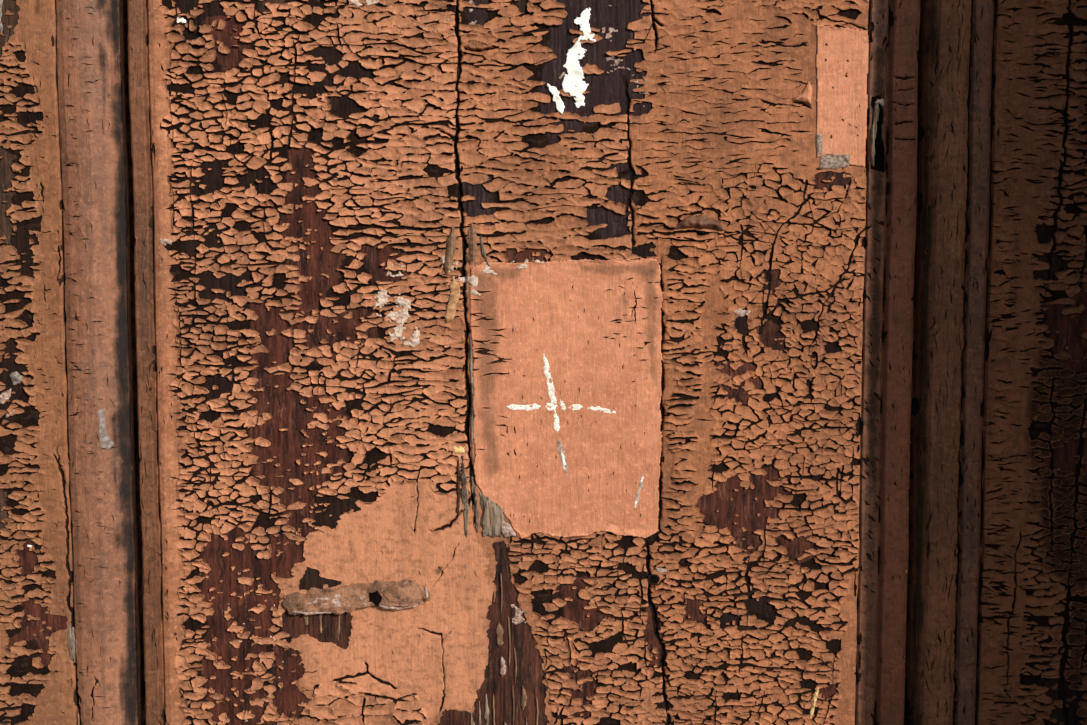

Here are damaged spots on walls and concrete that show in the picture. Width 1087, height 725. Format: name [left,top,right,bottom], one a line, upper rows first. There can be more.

peeling [203,15,251,71]
peeling [538,0,668,146]
peeling [457,176,497,237]
peeling [582,159,638,240]
peeling [358,245,410,285]
peeling [0,341,28,421]
peeling [246,142,377,537]
crack [159,0,872,725]
peeling [696,467,814,566]
peeling [199,525,430,725]
peeling [437,540,549,725]
peeling [560,584,614,631]